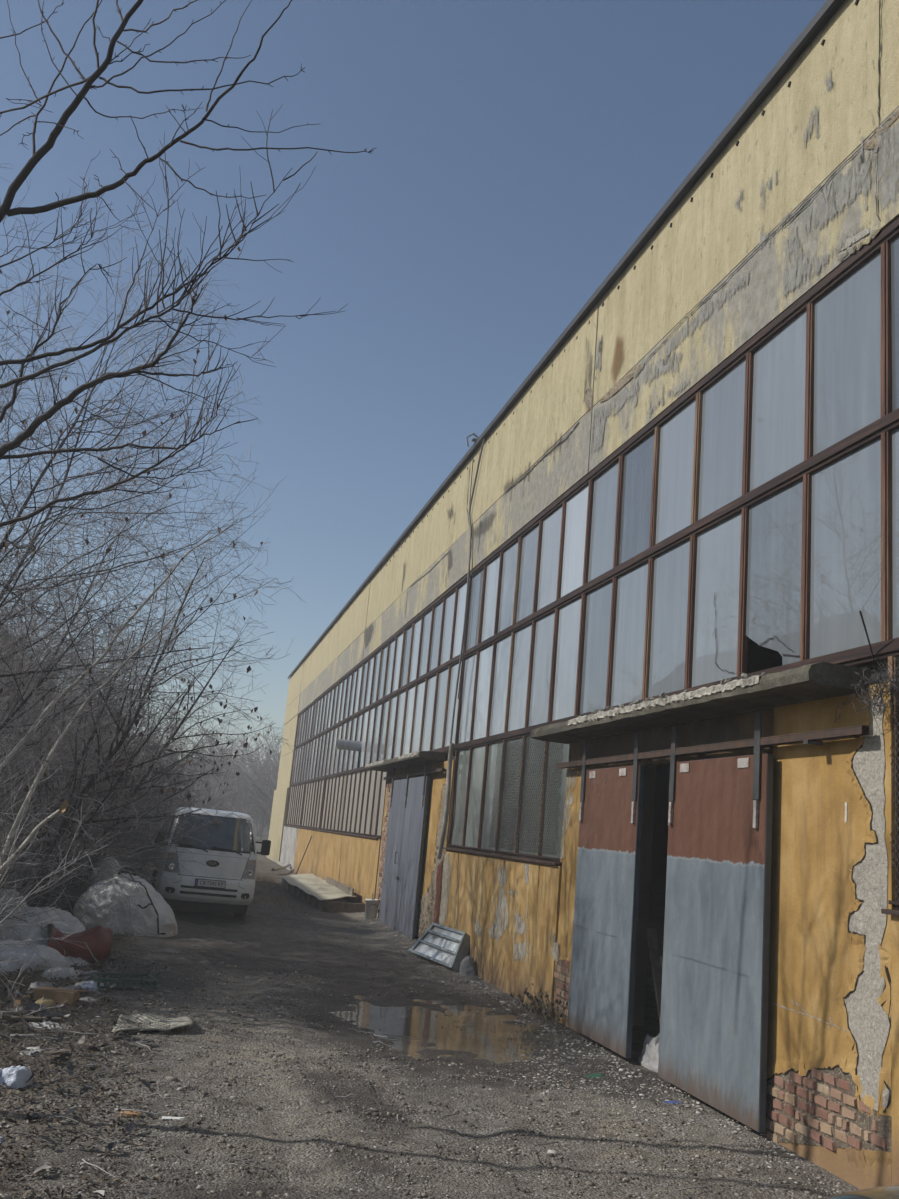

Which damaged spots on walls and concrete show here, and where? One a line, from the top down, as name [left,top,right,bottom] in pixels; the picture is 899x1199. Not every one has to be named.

crack [646,0,895,361]
rust [613,340,622,378]
peeling [585,337,687,418]
peeling [474,853,529,973]
flaking render [763,685,892,1168]